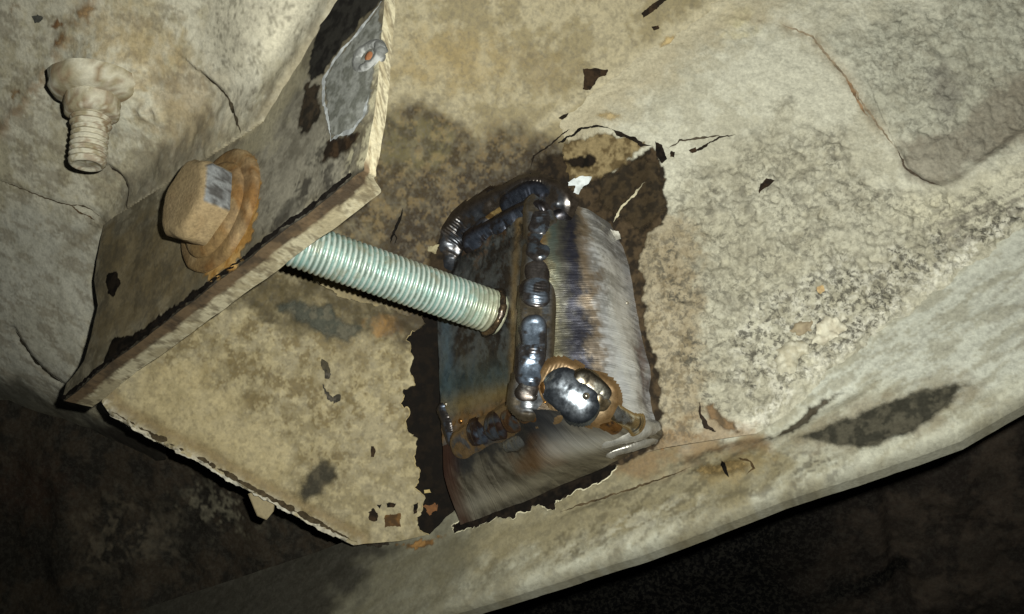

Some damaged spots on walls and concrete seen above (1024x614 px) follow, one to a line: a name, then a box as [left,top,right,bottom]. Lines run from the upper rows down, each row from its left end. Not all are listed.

crack [782,24,939,185]
crack [531,125,735,165]
peeling [655,141,667,163]
corrosion [205,181,262,281]
peeling [321,359,341,404]
peeling [400,313,618,535]
damp [765,384,960,448]
damp [301,461,337,501]
peeling [368,502,396,522]